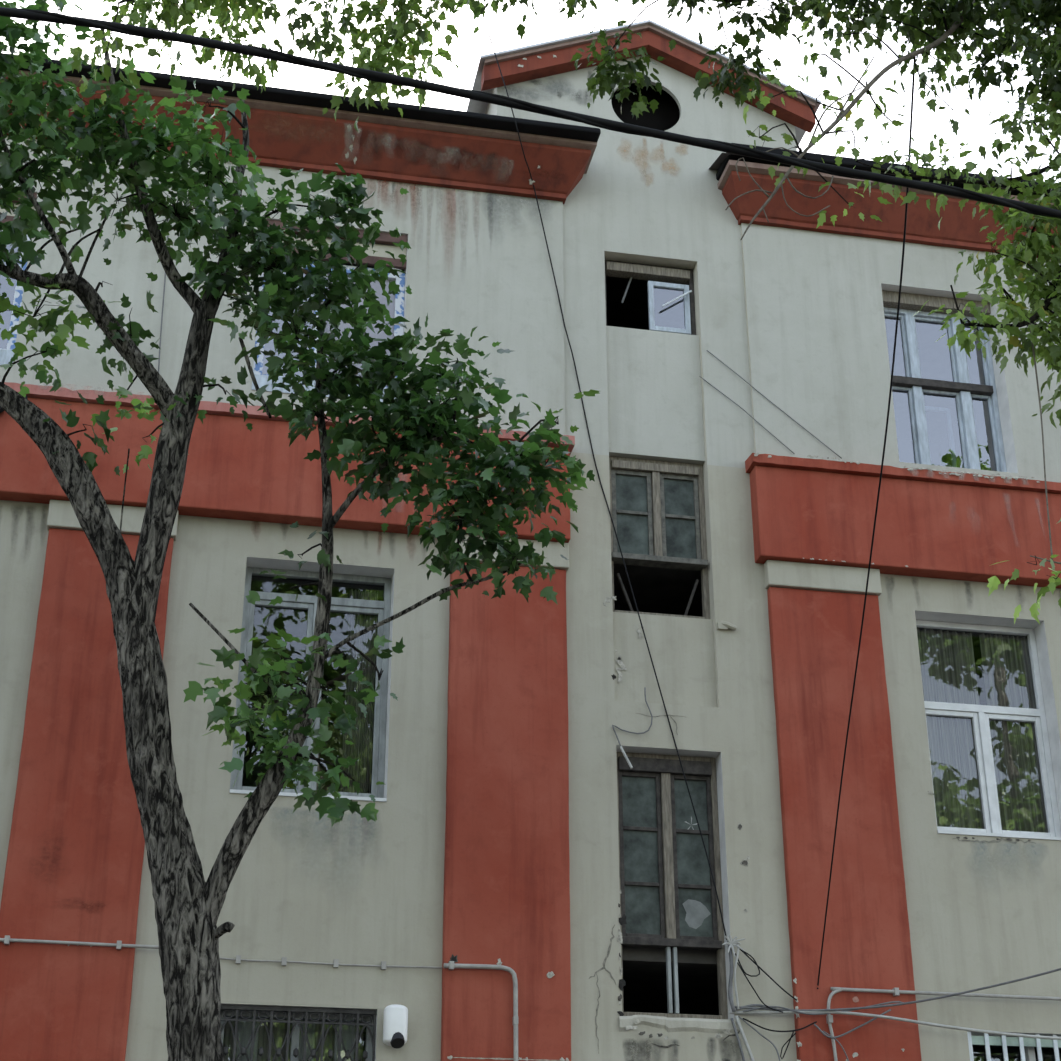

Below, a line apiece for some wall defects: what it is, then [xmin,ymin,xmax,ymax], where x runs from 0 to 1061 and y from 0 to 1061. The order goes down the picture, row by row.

crack [589,925,616,1054]